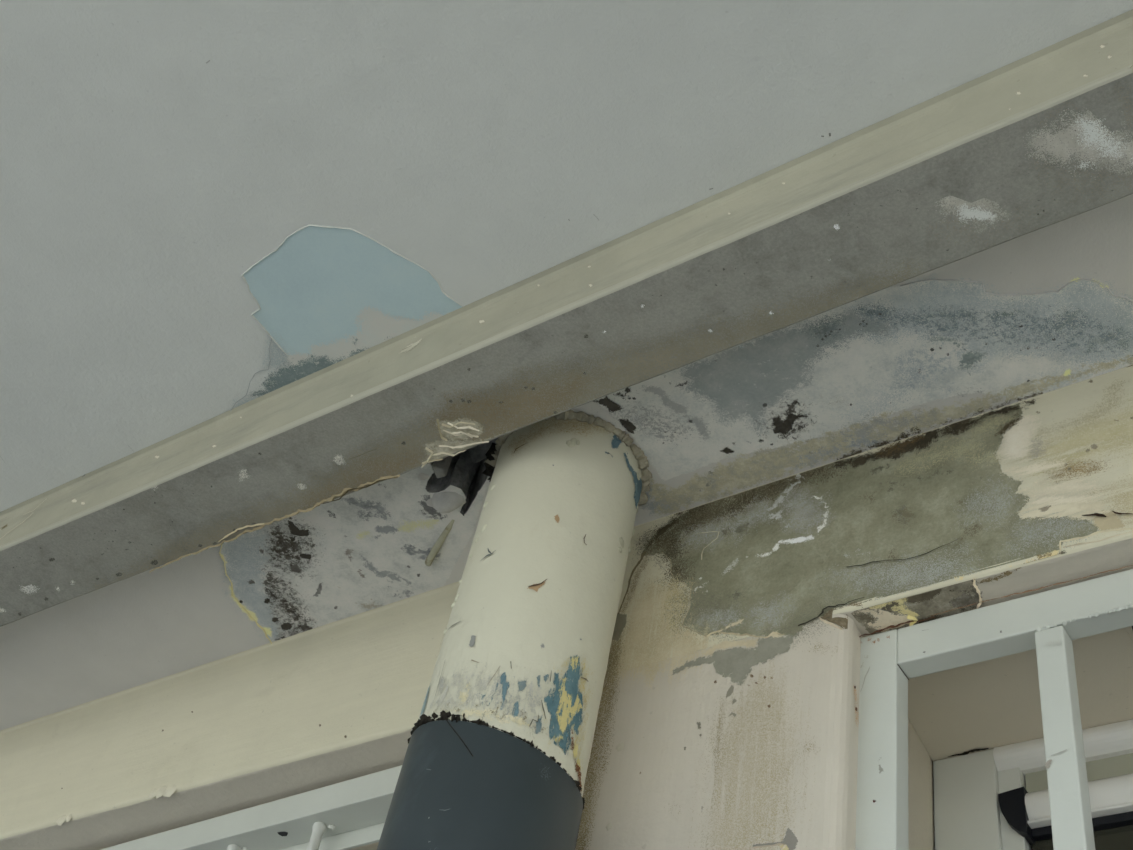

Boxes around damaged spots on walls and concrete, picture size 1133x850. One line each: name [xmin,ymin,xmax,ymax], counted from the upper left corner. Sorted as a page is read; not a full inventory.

leakage [926,82,1133,253]
peeling [241,225,464,368]
peeling [149,417,523,644]
leakage [89,251,1133,850]
flaking render [595,274,1133,717]
peeling [427,648,594,778]